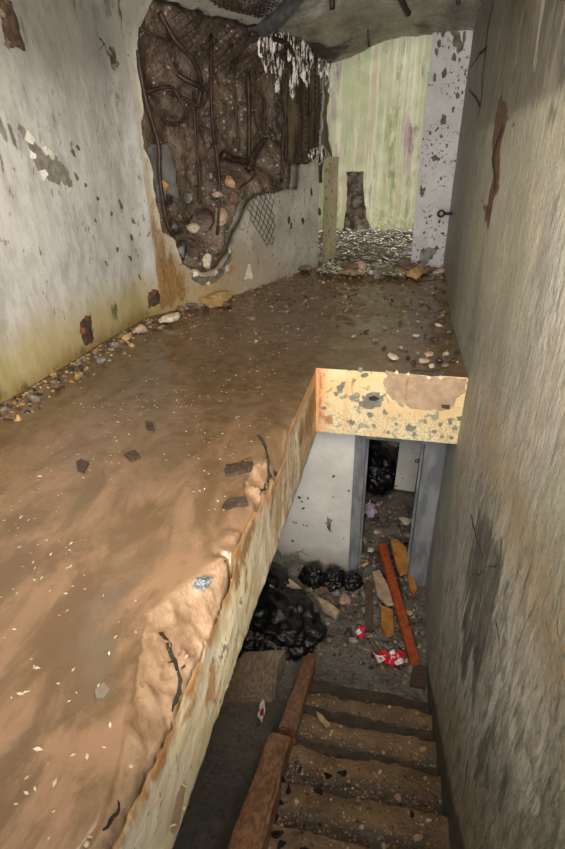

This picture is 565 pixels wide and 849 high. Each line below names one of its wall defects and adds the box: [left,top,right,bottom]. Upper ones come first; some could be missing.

spalling [0,0,26,51]
spalling [136,2,338,286]
rust [482,96,514,229]
rust [152,222,185,308]
flaking render [358,370,468,440]
crack [159,632,183,712]